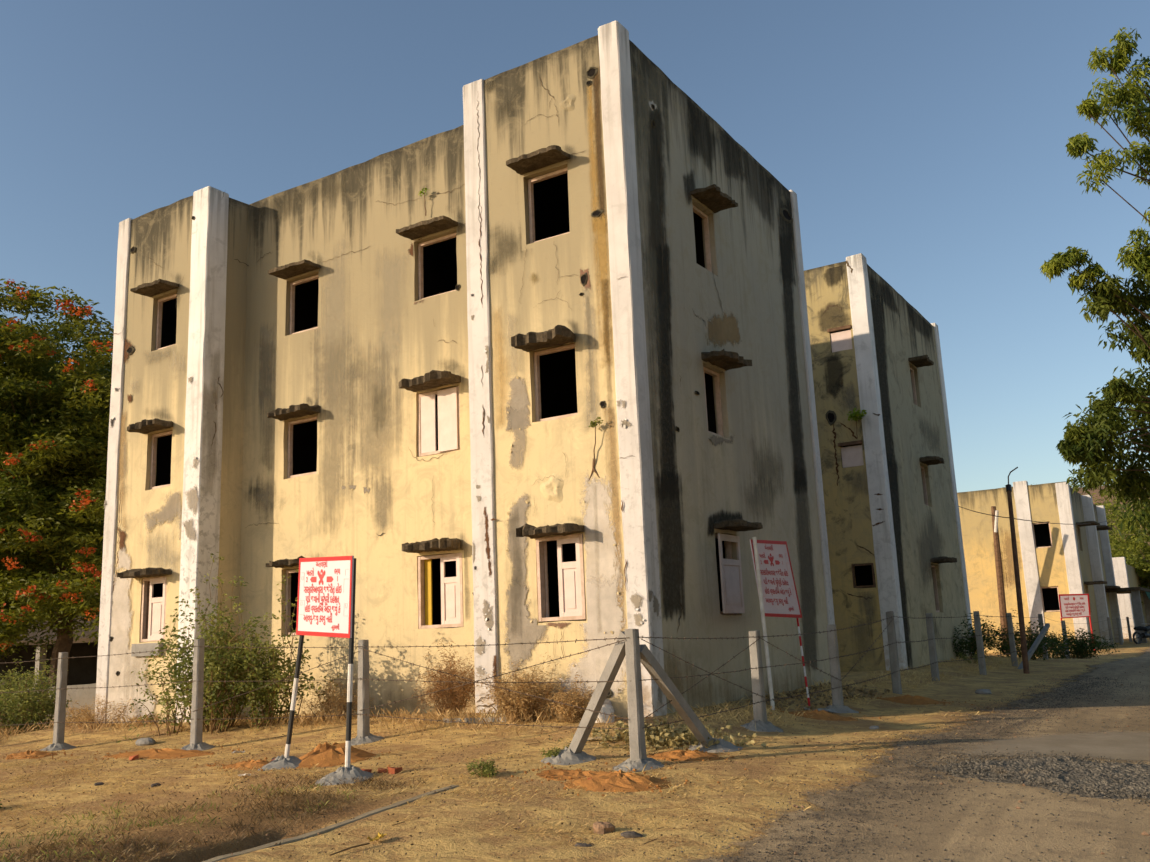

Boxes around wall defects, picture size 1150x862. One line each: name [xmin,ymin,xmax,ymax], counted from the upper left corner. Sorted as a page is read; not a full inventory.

water stain [689,104,743,179]
crack [376,97,483,308]
water stain [825,266,843,285]
water stain [637,81,685,618]
peeling [707,313,742,347]
water stain [826,356,855,408]
peeling [506,376,530,468]
water stain [778,202,817,667]
peeling [144,486,198,564]
water stain [375,484,391,536]
water stain [708,510,742,536]
peeling [472,476,659,712]